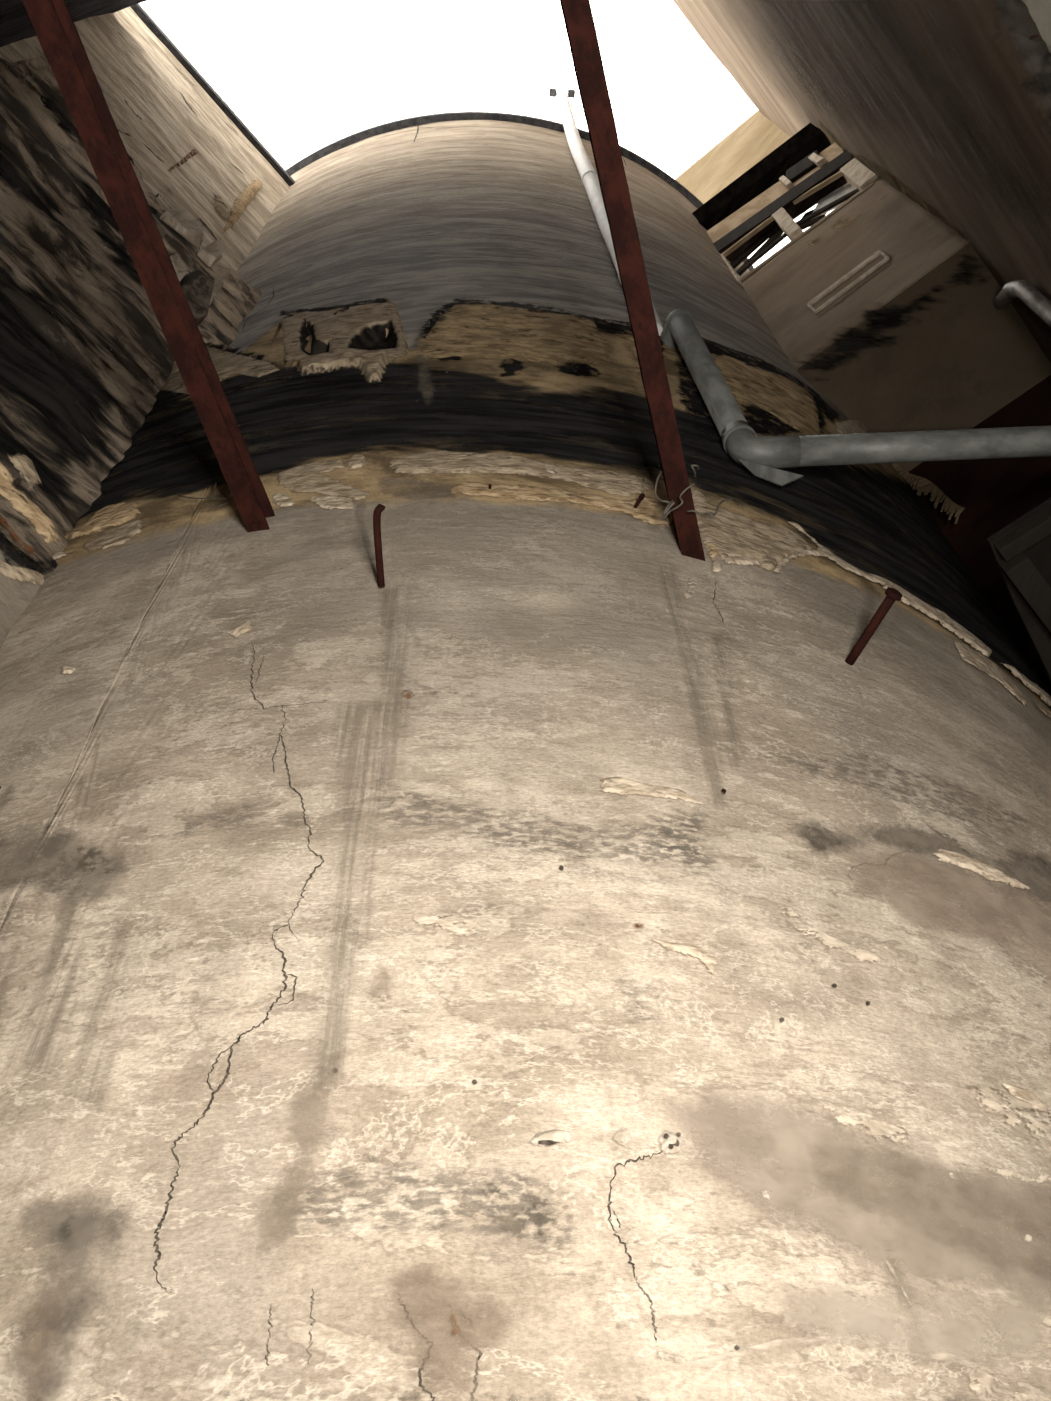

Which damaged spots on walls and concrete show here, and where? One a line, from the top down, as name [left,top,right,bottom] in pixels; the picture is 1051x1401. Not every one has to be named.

spalling [163,361,189,394]
spalling [207,301,640,382]
spalling [0,454,142,559]
spalling [272,450,673,527]
spalling [0,558,47,585]
peeling [227,621,252,638]
spalling [684,487,1051,717]
crack [153,641,327,1293]
water stain [267,1170,305,1236]
crack [607,1151,663,1341]
water stain [24,1204,119,1396]
crack [398,1293,483,1401]